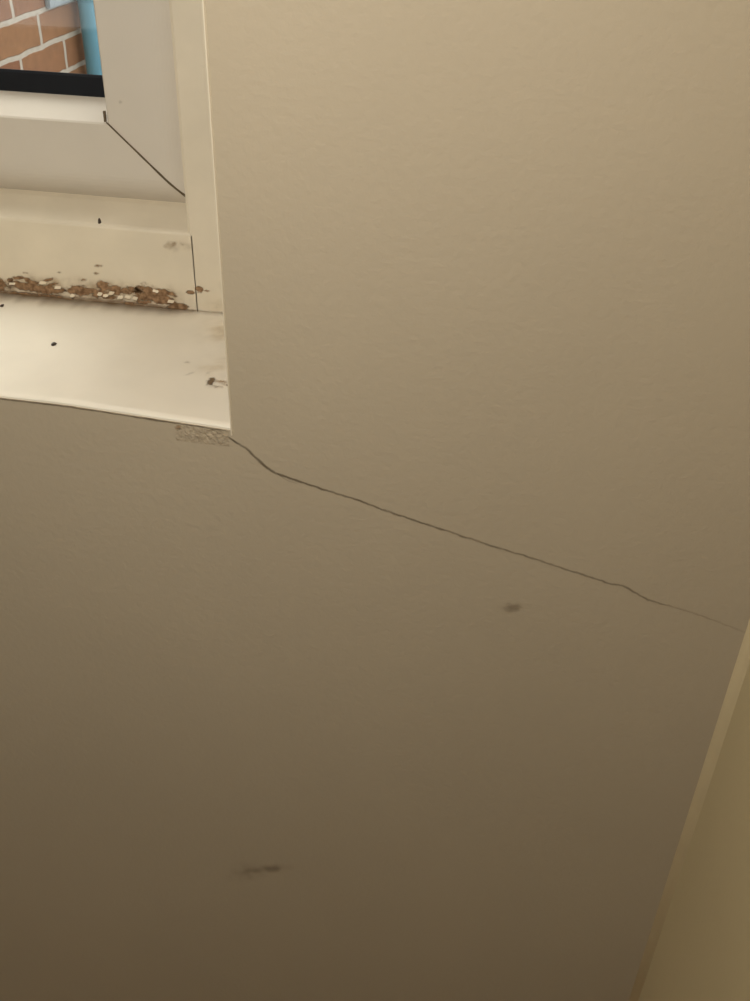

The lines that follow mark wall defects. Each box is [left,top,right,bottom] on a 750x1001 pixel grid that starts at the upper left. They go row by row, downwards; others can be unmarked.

peeling [0,265,208,310]